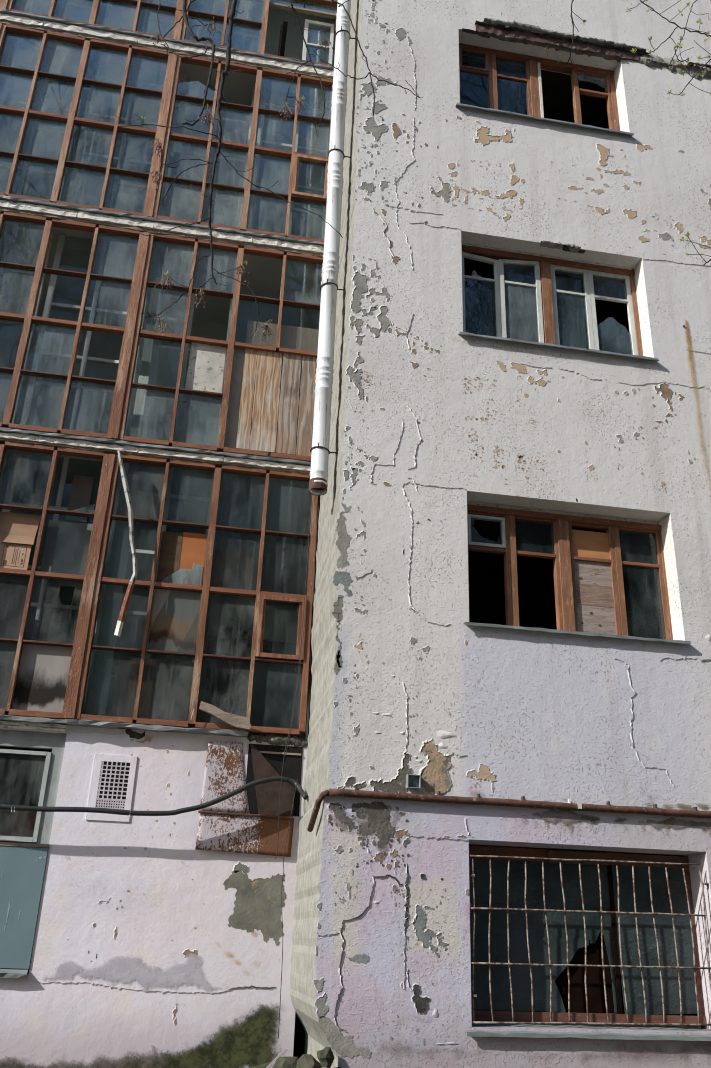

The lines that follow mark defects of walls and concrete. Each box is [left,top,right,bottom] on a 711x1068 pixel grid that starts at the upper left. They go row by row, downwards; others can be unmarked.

peeling [345,0,526,429]
peeling [540,143,683,255]
crack [357,402,467,627]
crack [615,659,674,787]
corrosion [195,741,301,857]
flaking render [316,730,497,929]
crack [411,818,473,842]
peeling [43,948,216,990]
crack [32,981,277,995]
flaking render [223,861,287,946]
crack [318,838,412,1033]
flaking render [400,982,433,1015]